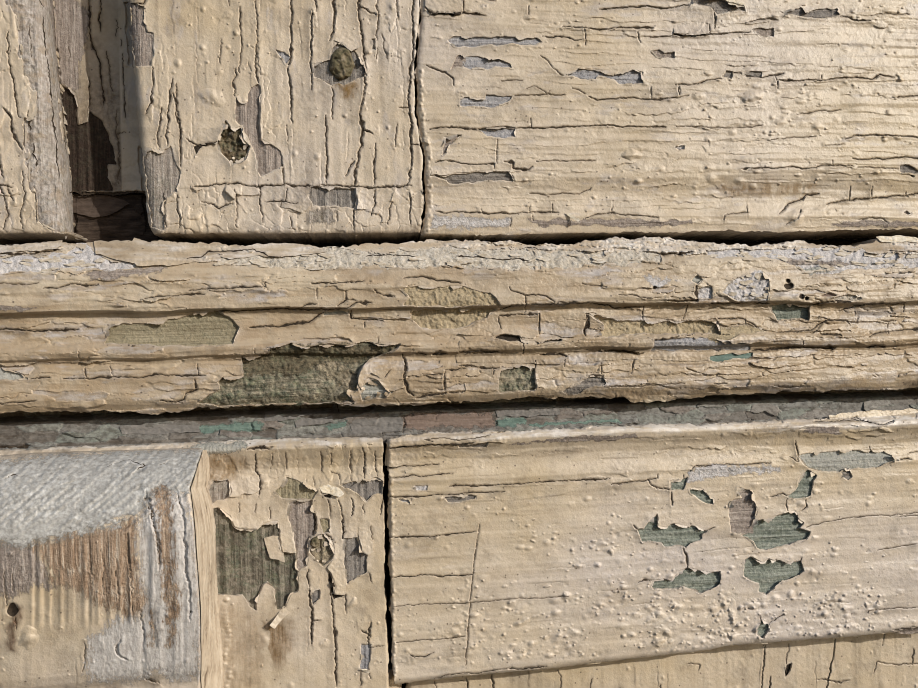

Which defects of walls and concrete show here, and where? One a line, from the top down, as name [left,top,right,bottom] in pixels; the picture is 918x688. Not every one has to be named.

peeling [651,50,674,58]
peeling [0,0,661,281]
crack [0,0,918,229]
crack [0,248,60,256]
crack [187,249,281,259]
peeling [528,213,693,229]
peeling [705,210,918,275]
crack [140,254,461,353]
peeling [692,270,861,320]
crack [0,328,206,405]
peeling [0,286,900,687]
crack [306,569,346,686]